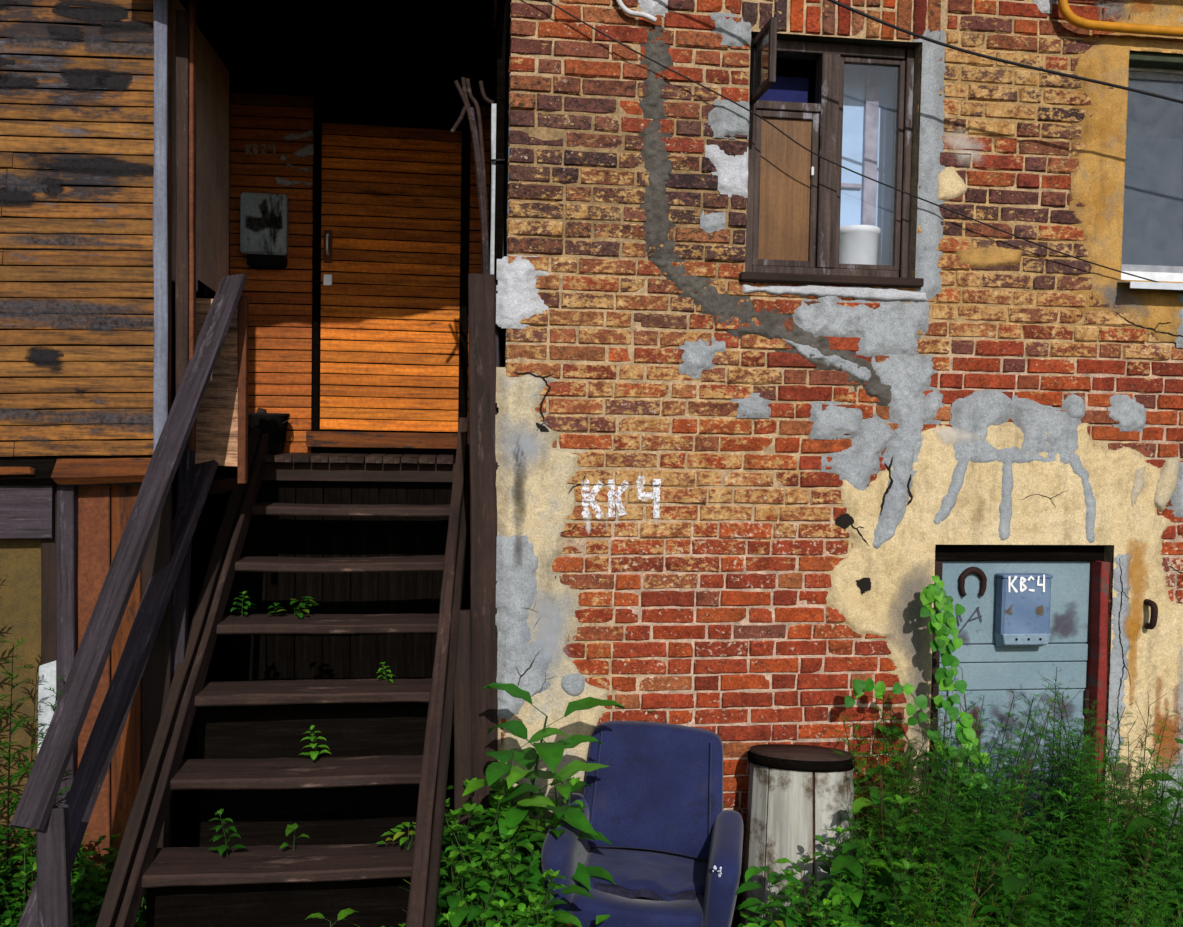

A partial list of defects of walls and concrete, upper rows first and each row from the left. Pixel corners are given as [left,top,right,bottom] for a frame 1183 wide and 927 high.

crack [638,26,892,406]
flaking render [937,167,968,202]
flaking render [952,244,1022,271]
crack [851,457,913,546]
corrosion [1125,547,1145,677]